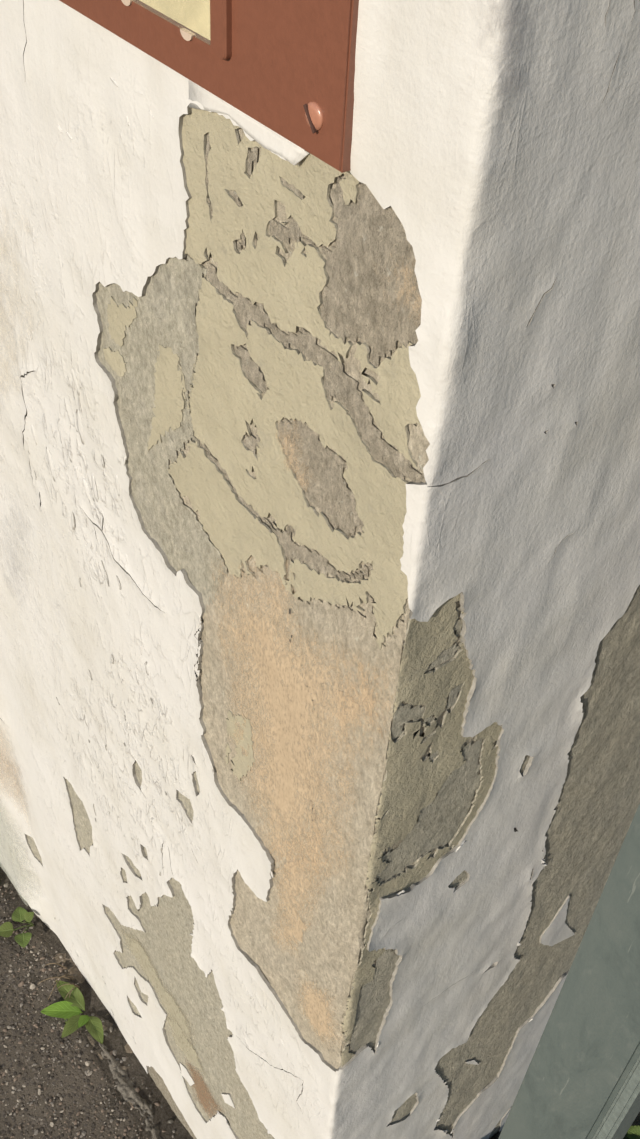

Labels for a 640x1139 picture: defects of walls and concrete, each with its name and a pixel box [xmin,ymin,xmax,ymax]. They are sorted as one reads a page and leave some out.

peeling [66,80,502,1069]
peeling [435,585,640,1135]